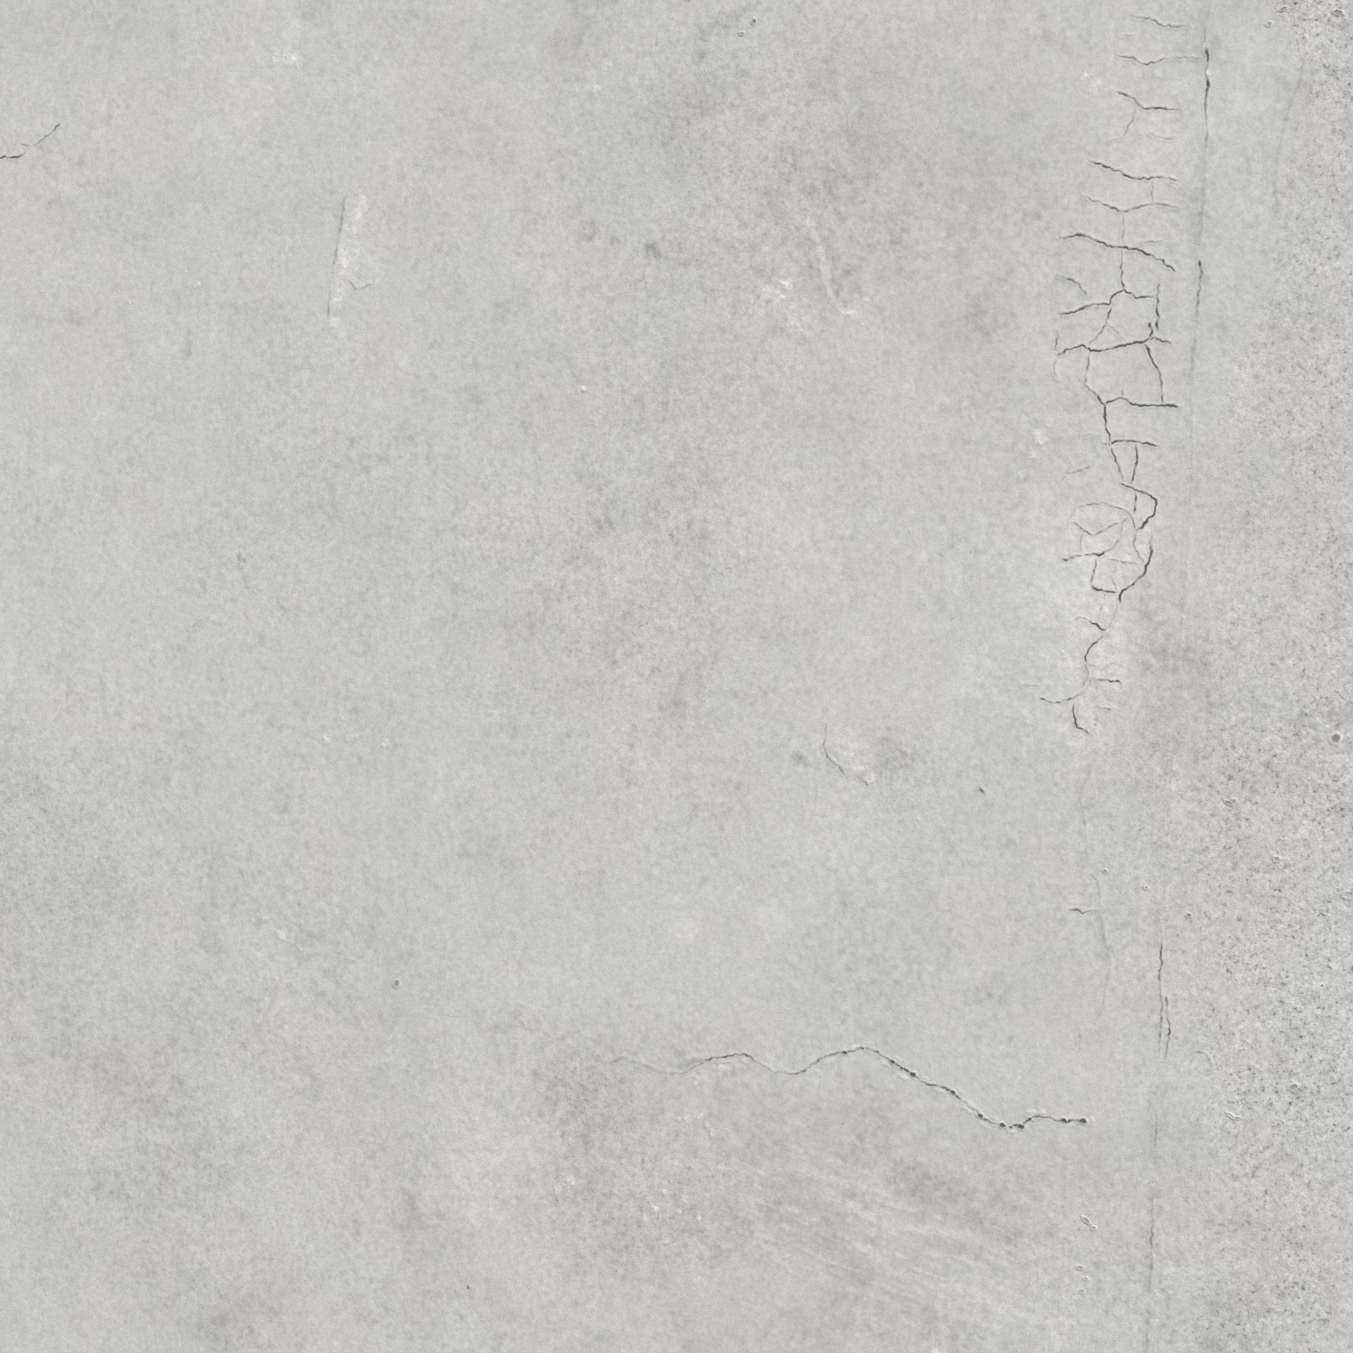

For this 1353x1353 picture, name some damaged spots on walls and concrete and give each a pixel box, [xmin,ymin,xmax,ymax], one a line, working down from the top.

crack [0,121,62,162]
crack [1018,0,1215,737]
crack [1154,730,1178,1063]
crack [606,1041,1096,1135]